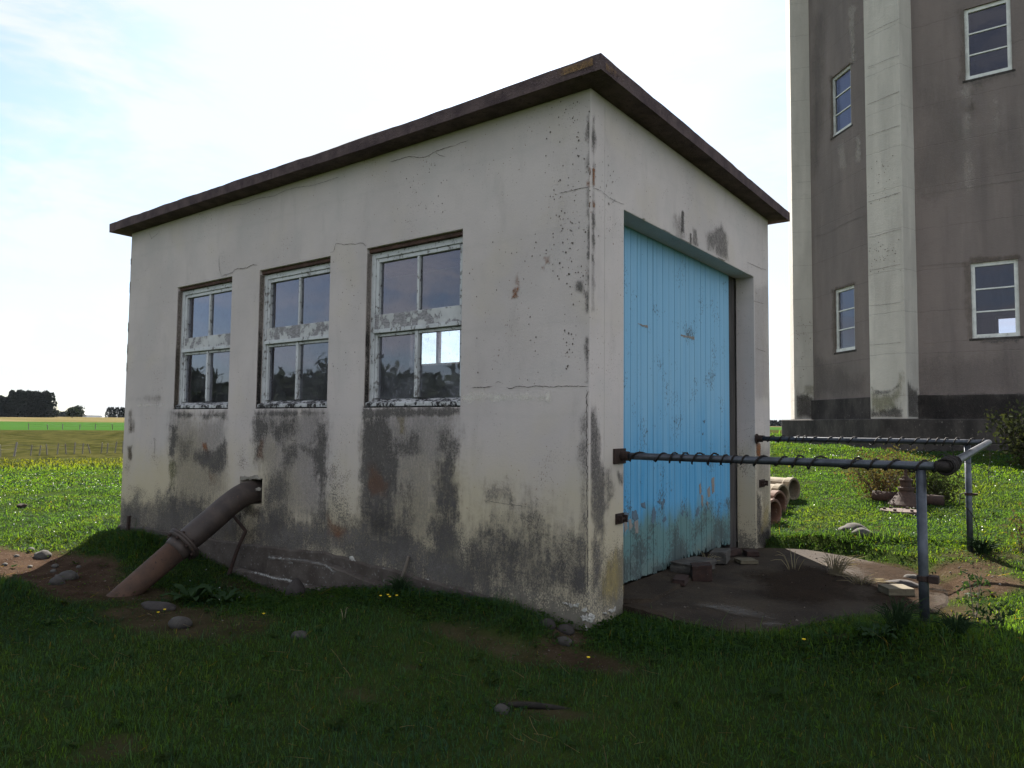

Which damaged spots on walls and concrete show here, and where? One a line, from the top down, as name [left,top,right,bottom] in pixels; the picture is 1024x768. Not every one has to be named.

water stain [681,212,727,258]
water stain [123,291,226,530]
water stain [214,254,502,596]
crack [473,381,588,590]
water stain [481,412,622,592]
peeling [624,499,666,534]